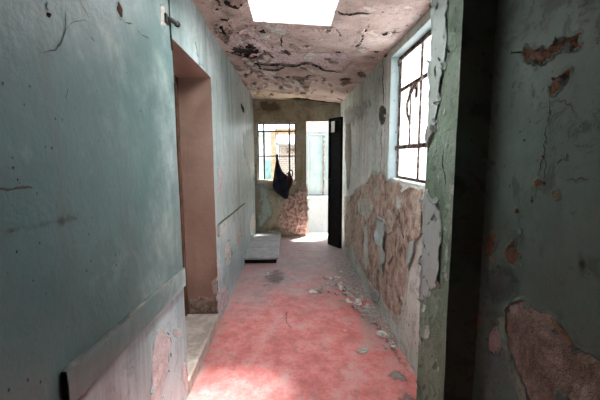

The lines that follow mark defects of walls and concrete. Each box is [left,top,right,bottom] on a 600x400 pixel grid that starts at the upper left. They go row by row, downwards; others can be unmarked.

crack [35,1,88,53]
crack [248,36,342,74]
peeling [209,0,388,101]
crack [330,10,371,50]
peeling [424,0,455,148]
spalling [521,28,585,67]
spalling [547,65,574,98]
crack [531,93,577,203]
spalling [278,180,309,235]
spalling [344,169,446,370]
spalling [150,326,182,400]
spalling [486,295,600,400]